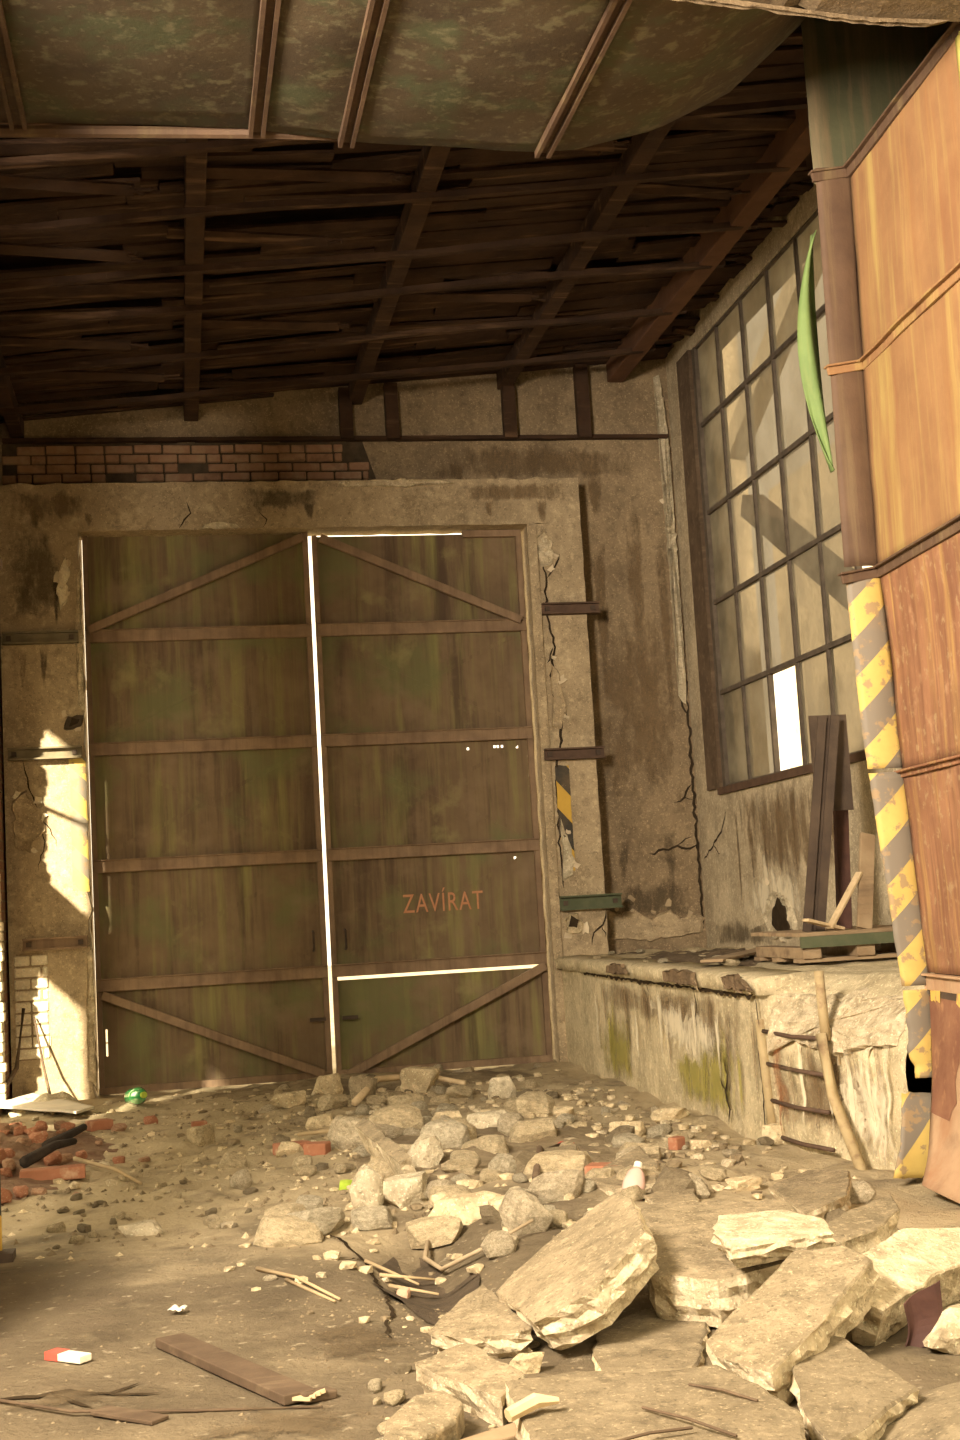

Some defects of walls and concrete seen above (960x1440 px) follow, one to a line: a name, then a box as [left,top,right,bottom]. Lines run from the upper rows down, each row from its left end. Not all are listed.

damp [20,493,90,619]
crack [542,554,567,887]
crack [651,680,726,929]
hole [763,877,798,943]
flaking render [0,874,52,1101]
damp [595,987,757,1113]
crack [330,1235,396,1339]